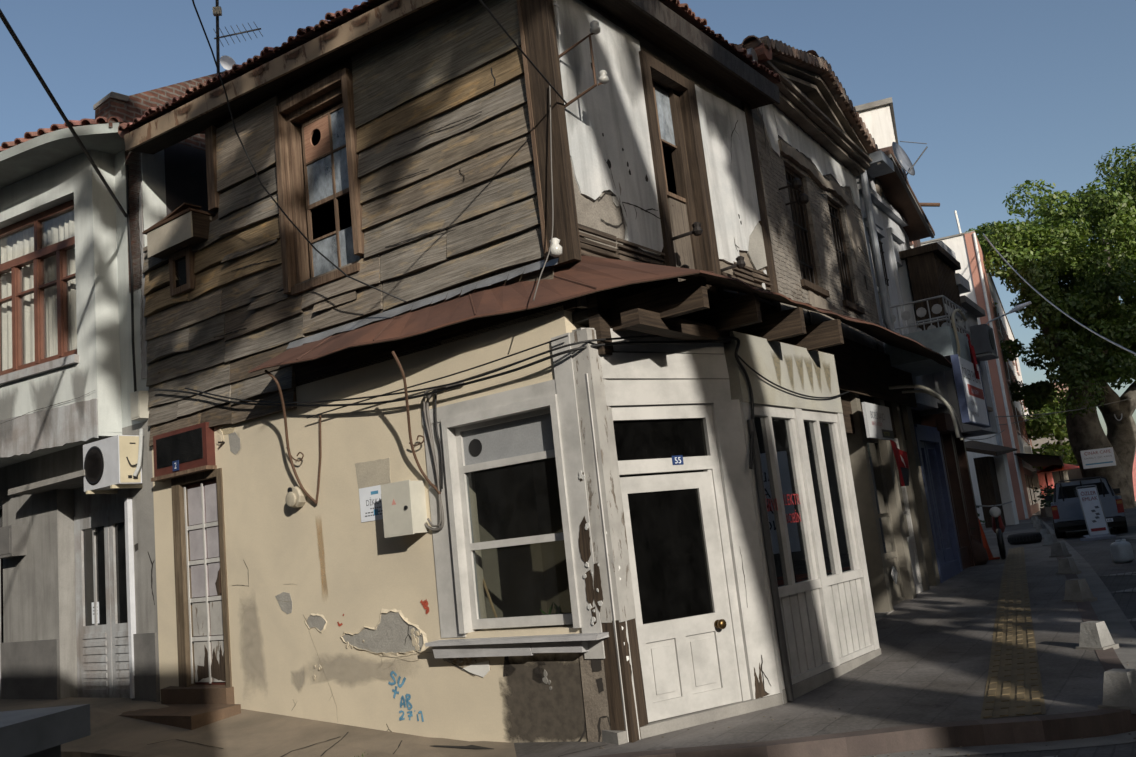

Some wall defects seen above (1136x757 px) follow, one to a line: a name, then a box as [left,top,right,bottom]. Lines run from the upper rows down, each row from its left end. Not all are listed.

spalling [571,148,666,266]
spalling [721,152,812,325]
spalling [303,613,327,633]
spalling [341,608,428,656]
peeling [579,516,603,626]